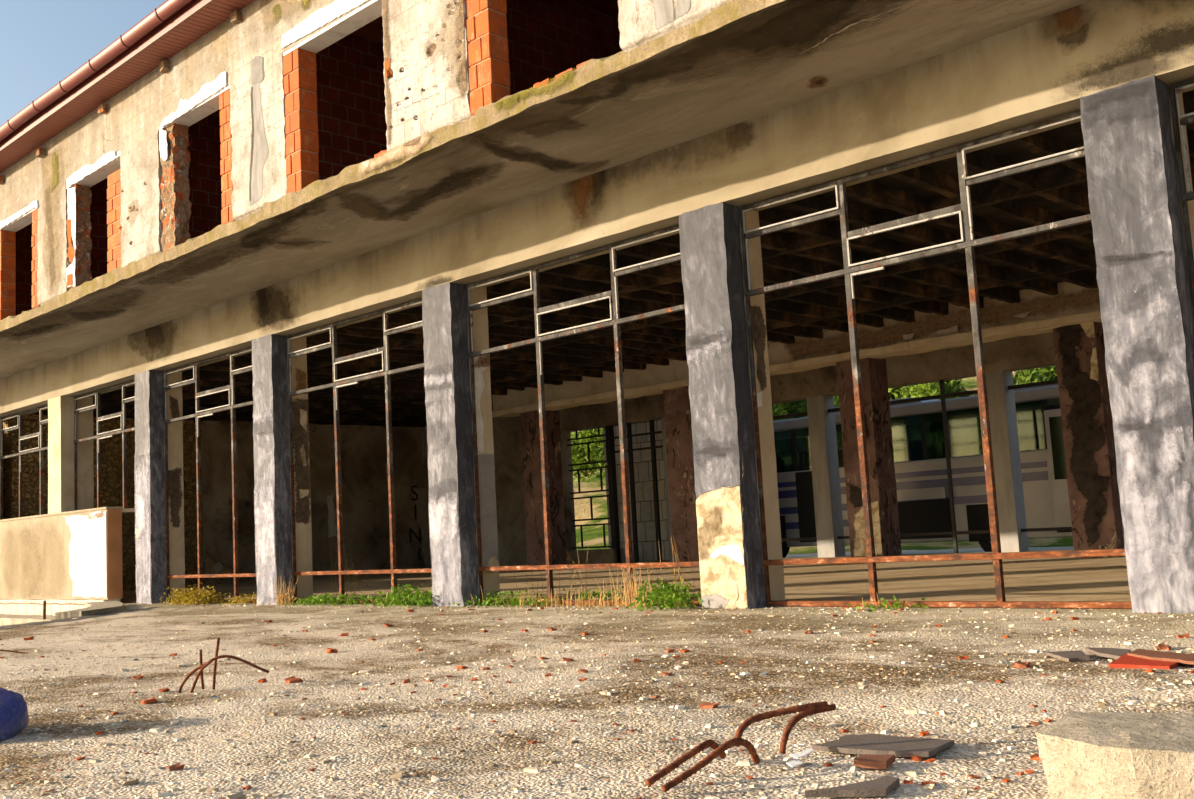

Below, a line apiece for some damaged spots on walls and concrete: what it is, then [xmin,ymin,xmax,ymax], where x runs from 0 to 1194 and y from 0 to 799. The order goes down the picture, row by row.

water stain [517,0,902,137]
water stain [1065,20,1194,103]
peeling [159,128,167,161]
water stain [0,130,601,339]
water stain [131,321,175,362]